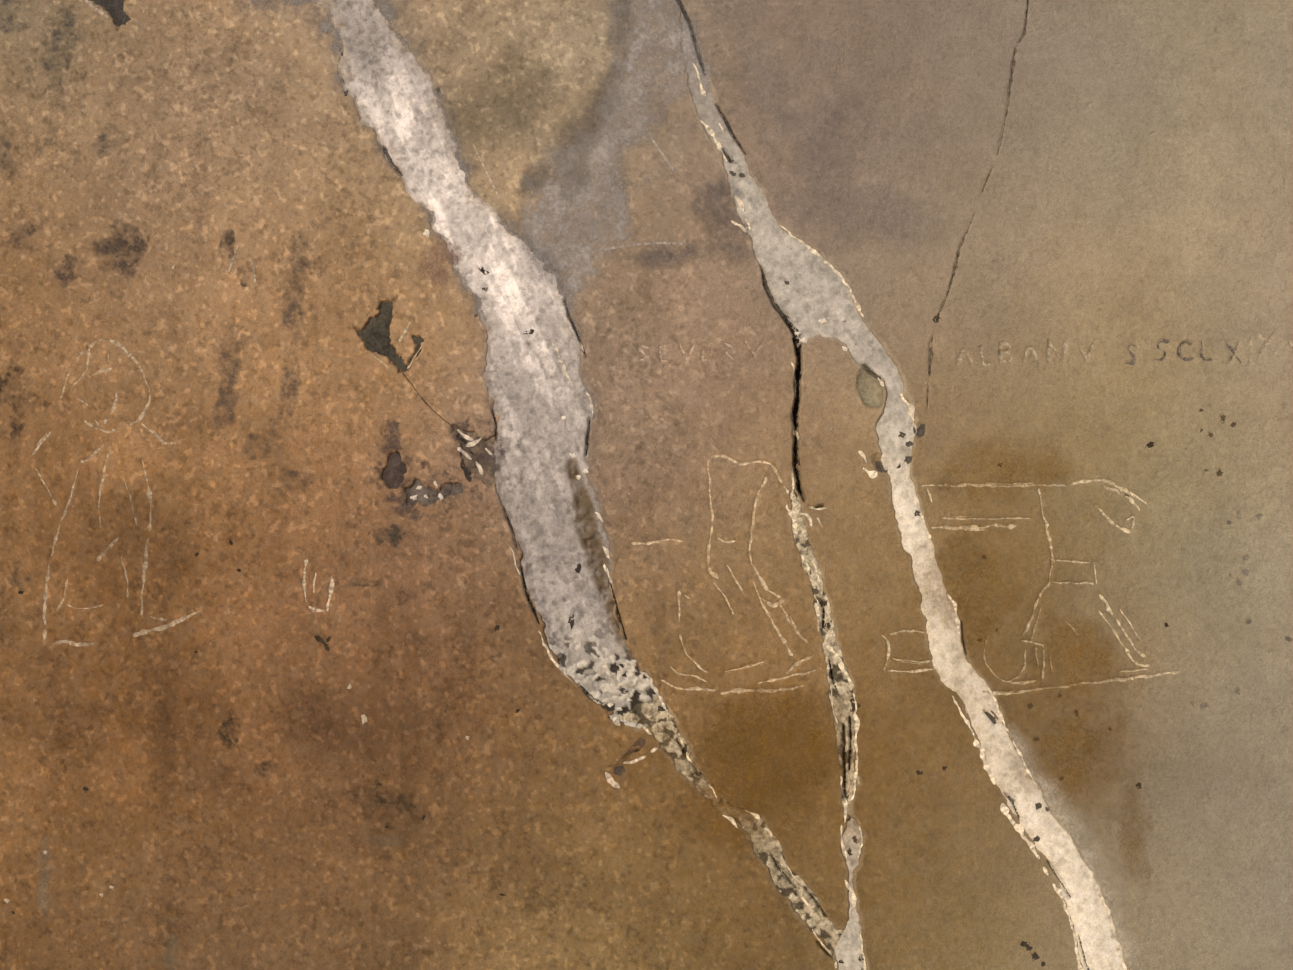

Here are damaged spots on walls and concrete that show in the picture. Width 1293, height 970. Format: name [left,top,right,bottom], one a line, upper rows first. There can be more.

peeling [85,0,133,27]
damp [373,0,396,23]
damp [455,156,469,183]
damp [500,0,708,308]
damp [454,254,483,314]
spalling [357,302,424,373]
crack [311,0,1127,970]